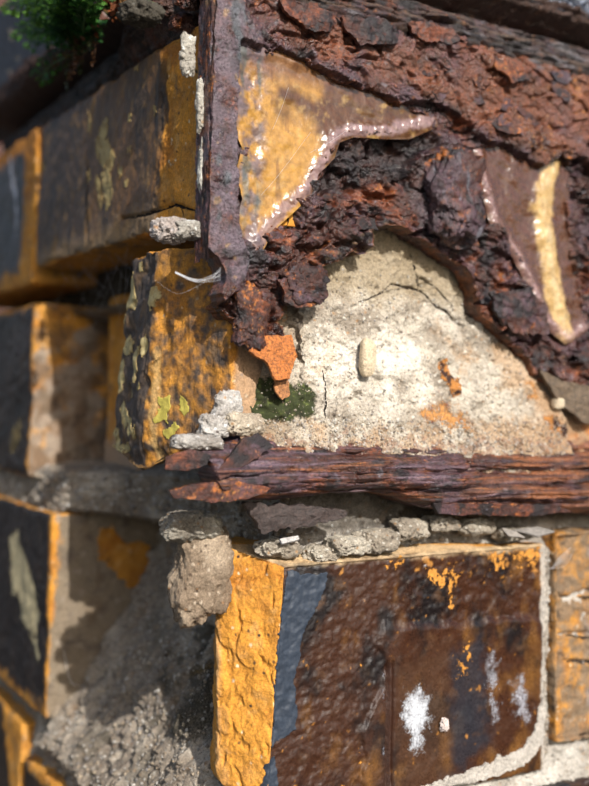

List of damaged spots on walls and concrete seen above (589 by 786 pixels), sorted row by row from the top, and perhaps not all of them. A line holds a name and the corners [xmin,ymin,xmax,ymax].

rust [277,0,399,47]
rust [406,20,468,46]
spalling [549,0,589,13]
rust [493,58,530,84]
peeling [87,110,128,211]
rust [276,277,325,309]
crack [359,254,458,324]
rust [475,286,550,336]
rust [248,335,297,400]
spalling [97,525,151,589]
spalling [489,527,555,571]
spalling [425,568,464,609]